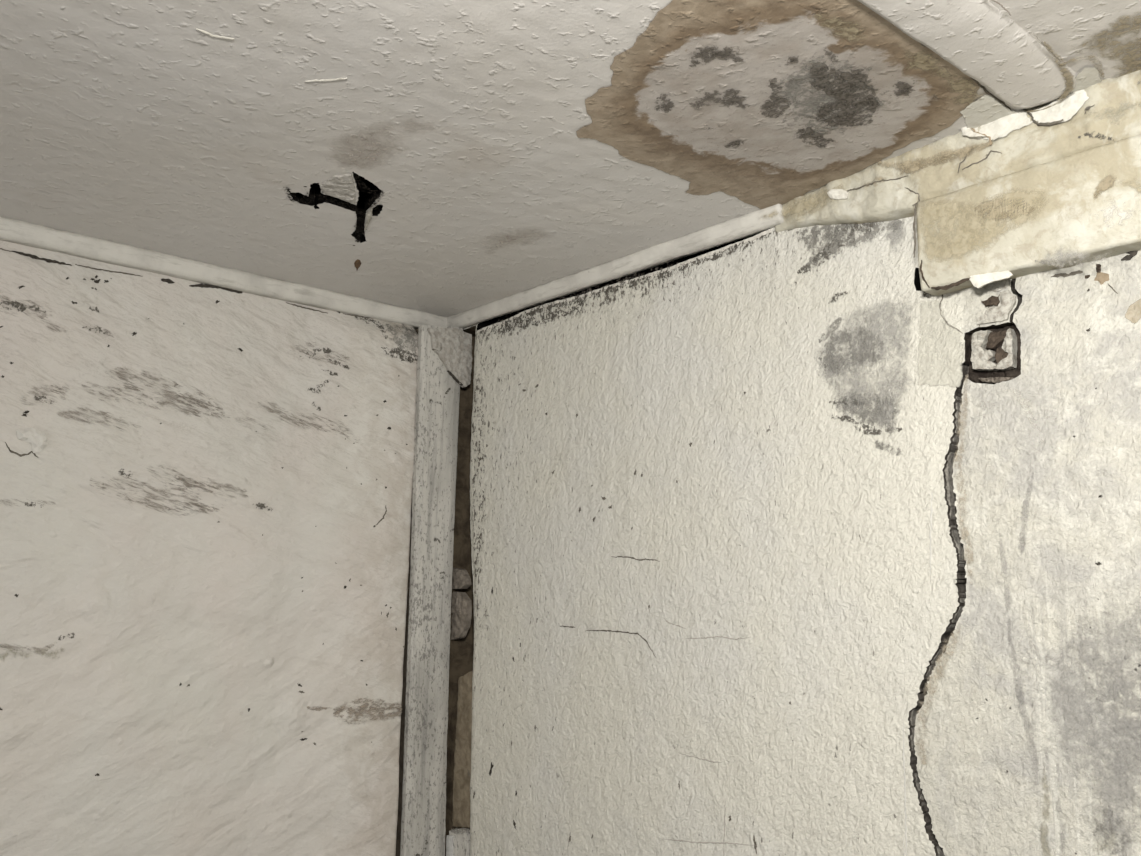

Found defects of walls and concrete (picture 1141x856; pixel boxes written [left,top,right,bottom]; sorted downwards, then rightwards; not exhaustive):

damp [576,0,992,217]
flaking render [960,67,1102,146]
flaking render [827,189,850,200]
crack [958,150,1001,173]
damp [475,233,771,343]
crack [847,175,1023,333]
crack [1051,270,1083,278]
peeling [1085,264,1118,294]
crack [1121,251,1138,261]
damp [818,307,910,455]
crack [908,363,972,856]